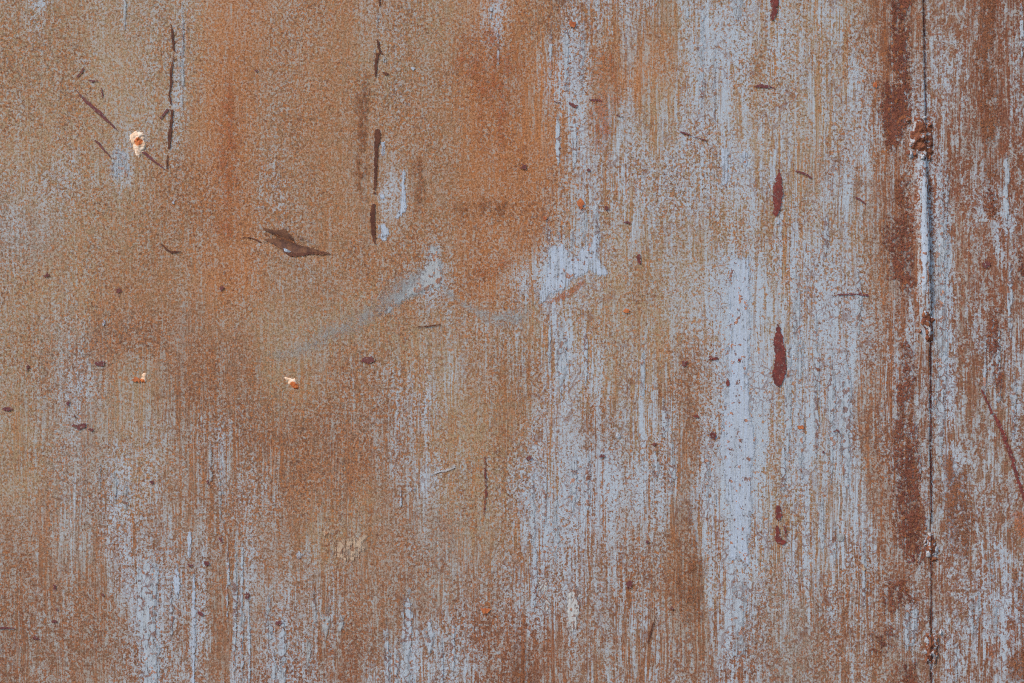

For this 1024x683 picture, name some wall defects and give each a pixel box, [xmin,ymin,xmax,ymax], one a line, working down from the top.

peeling [770,0,779,21]
rust [872,0,927,159]
rust [973,0,1000,216]
peeling [538,206,609,305]
peeling [772,169,784,224]
rust [879,176,917,293]
peeling [772,275,852,490]
rust [985,309,1005,398]
peeling [704,256,757,657]
peeling [774,505,787,545]
rust [868,341,975,683]
rust [1008,570,1024,683]